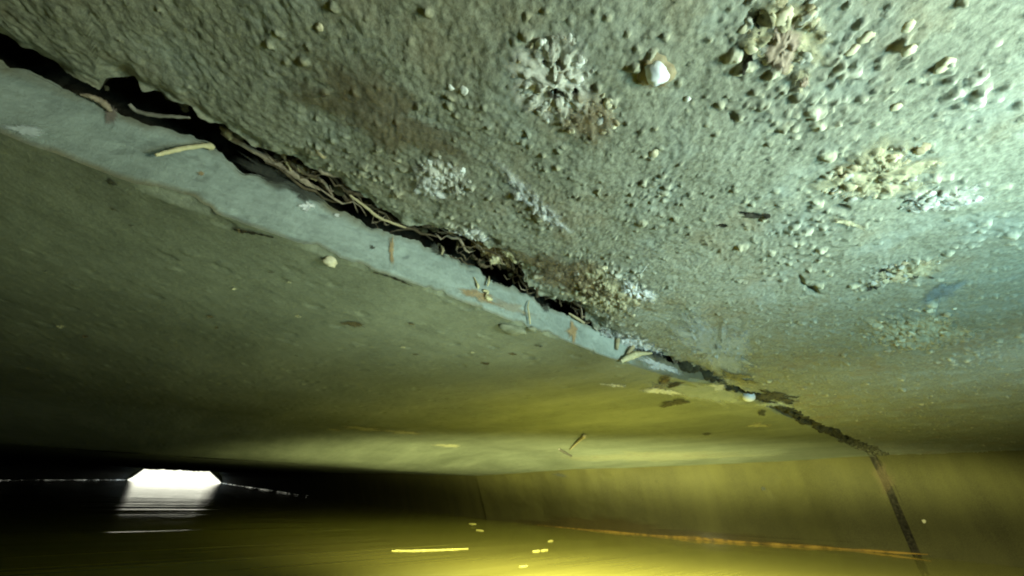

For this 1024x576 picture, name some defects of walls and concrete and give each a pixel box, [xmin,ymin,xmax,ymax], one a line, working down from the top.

crack [742,9,766,75]
crack [0,33,606,332]
efflorescence [416,178,444,199]
leakage [891,186,983,214]
crack [715,212,771,228]
efflorescence [623,283,654,302]
crack [867,269,934,291]
crack [636,348,922,557]